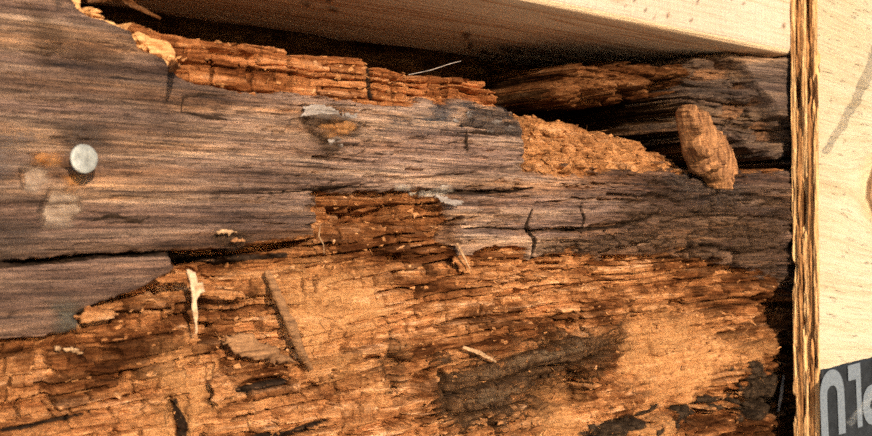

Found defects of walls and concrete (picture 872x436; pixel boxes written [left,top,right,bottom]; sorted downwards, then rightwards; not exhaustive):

spalling [80,3,696,177]
spalling [737,160,790,169]
crack [0,250,287,268]
peeling [216,229,252,247]
spalling [311,185,464,265]
crack [413,187,652,259]